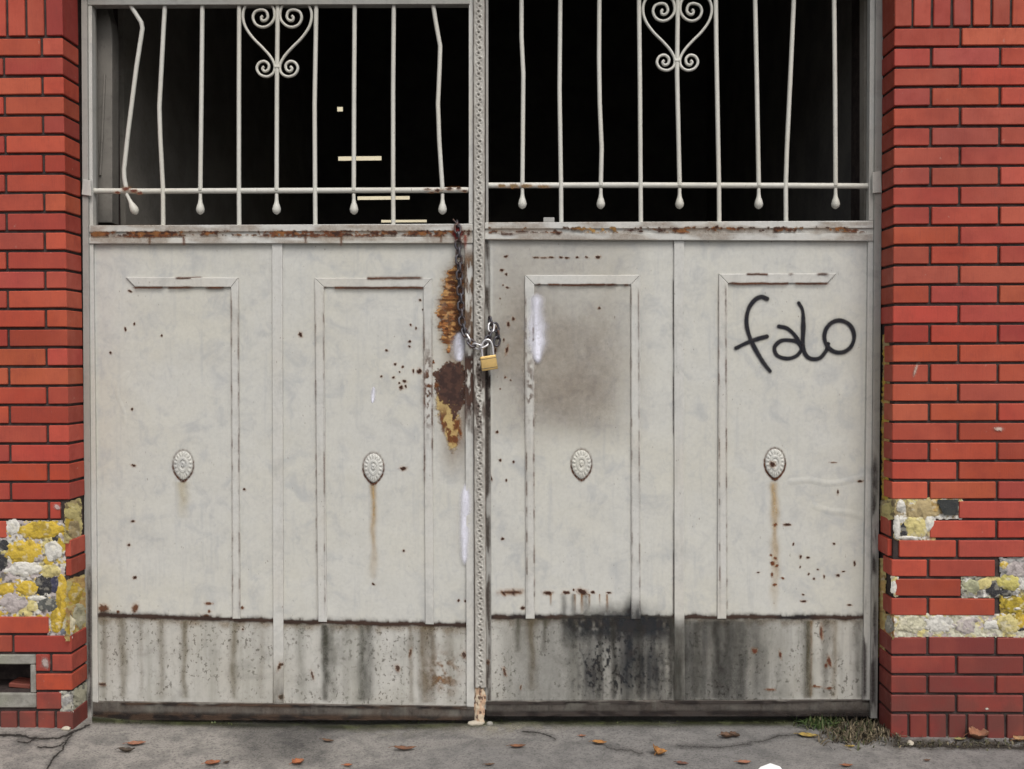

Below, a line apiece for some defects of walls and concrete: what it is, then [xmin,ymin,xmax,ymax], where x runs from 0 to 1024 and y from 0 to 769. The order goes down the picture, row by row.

corrosion [91,226,470,244]
corrosion [488,225,803,235]
corrosion [816,222,864,233]
corrosion [380,253,511,471]
spalling [0,498,86,641]
water stain [562,603,759,701]
spalling [878,557,1024,658]